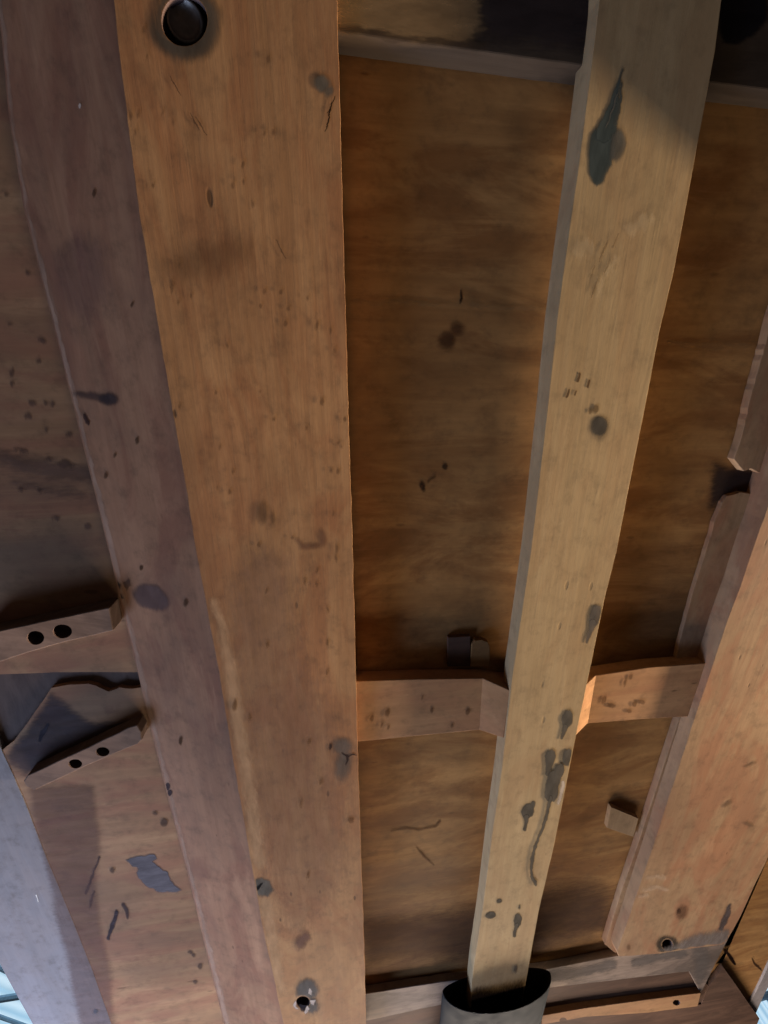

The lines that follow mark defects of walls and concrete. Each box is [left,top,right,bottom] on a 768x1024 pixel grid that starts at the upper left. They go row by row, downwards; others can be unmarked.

damp [589,69,626,186]
damp [78,393,118,405]
damp [589,405,607,436]
damp [133,585,168,610]
damp [585,605,601,643]
damp [521,710,573,886]